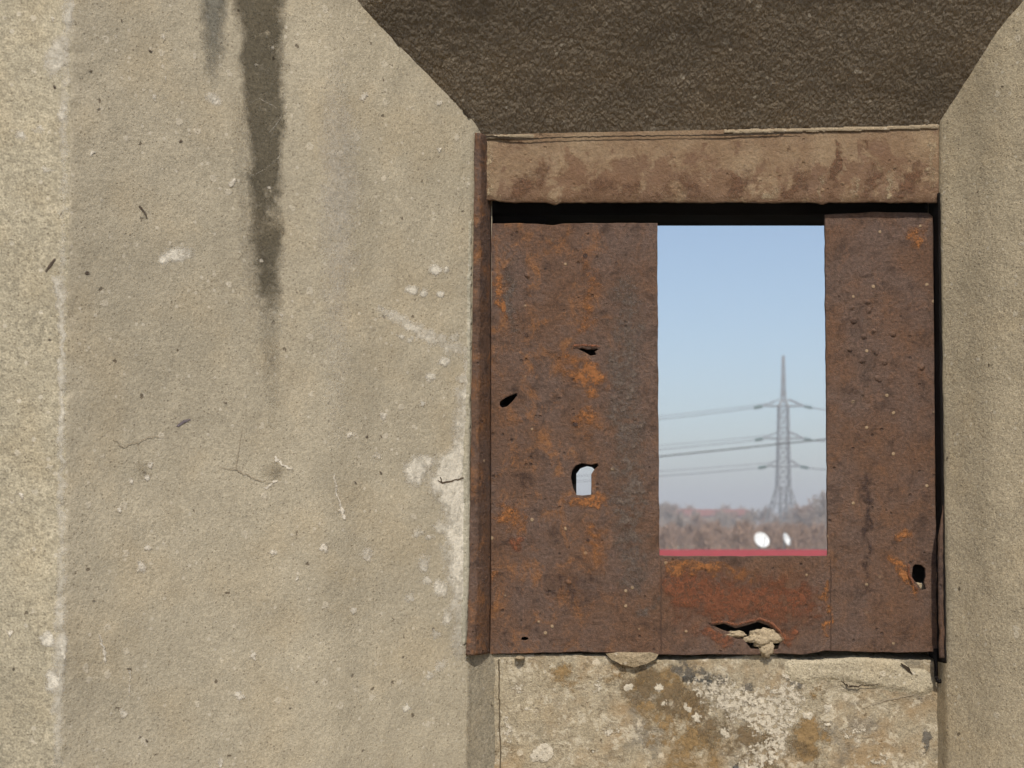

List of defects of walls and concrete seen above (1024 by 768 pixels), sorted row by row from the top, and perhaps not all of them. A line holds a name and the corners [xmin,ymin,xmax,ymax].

leakage [204,0,284,296]
rust [829,140,843,198]
rust [558,355,604,424]
peeling [758,642,774,658]
leakage [530,734,554,763]
leakage [684,671,866,768]